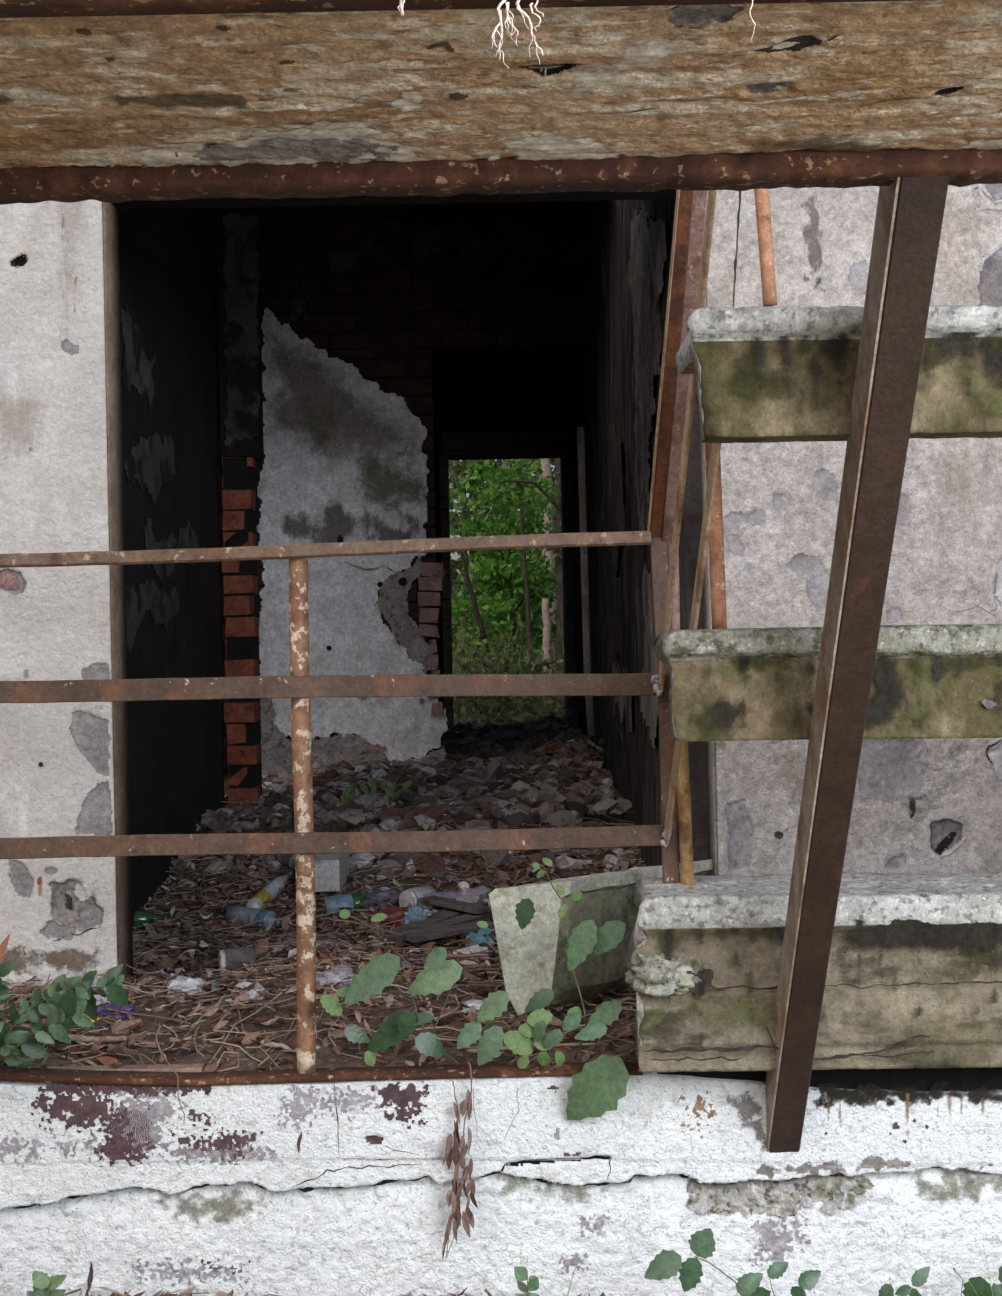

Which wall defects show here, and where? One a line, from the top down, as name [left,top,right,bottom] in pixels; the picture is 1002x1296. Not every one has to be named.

spalling [978,244,1002,306]
spalling [374,556,446,675]
damp [739,656,752,685]
damp [866,656,905,728]
peeling [69,710,112,835]
spalling [260,698,293,772]
spalling [311,733,398,767]
spalling [857,739,966,857]
spalling [9,859,103,940]
peeling [0,1082,430,1168]
crack [481,1155,854,1186]
spalling [85,1262,93,1296]